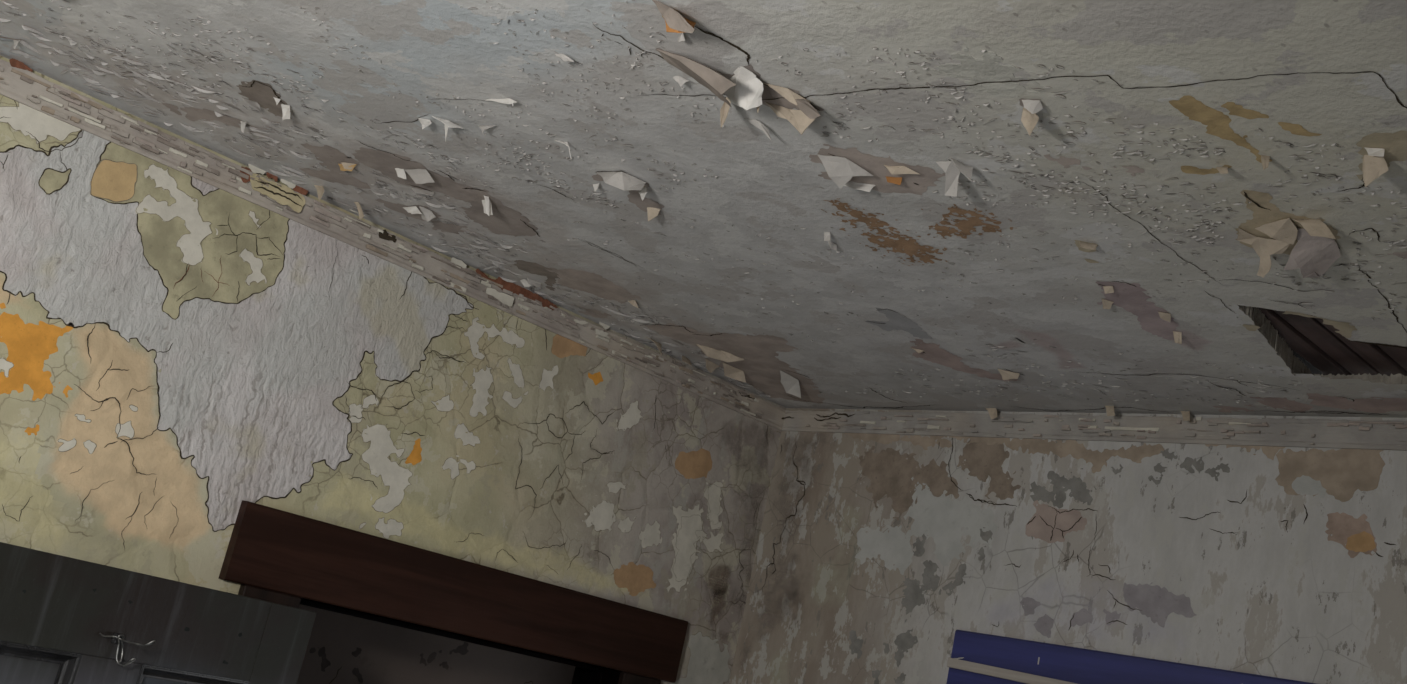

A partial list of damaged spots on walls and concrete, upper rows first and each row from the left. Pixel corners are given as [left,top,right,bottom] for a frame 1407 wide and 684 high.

crack [695,26,750,65]
peeling [652,0,824,141]
crack [762,71,1407,108]
crack [70,326,178,548]
peeling [0,40,826,540]
crack [346,292,547,436]
peeling [582,448,724,596]
water stain [761,490,873,622]
peeling [809,144,1013,265]
peeling [820,406,1230,684]
crack [1067,180,1407,348]
peeling [1176,393,1407,558]